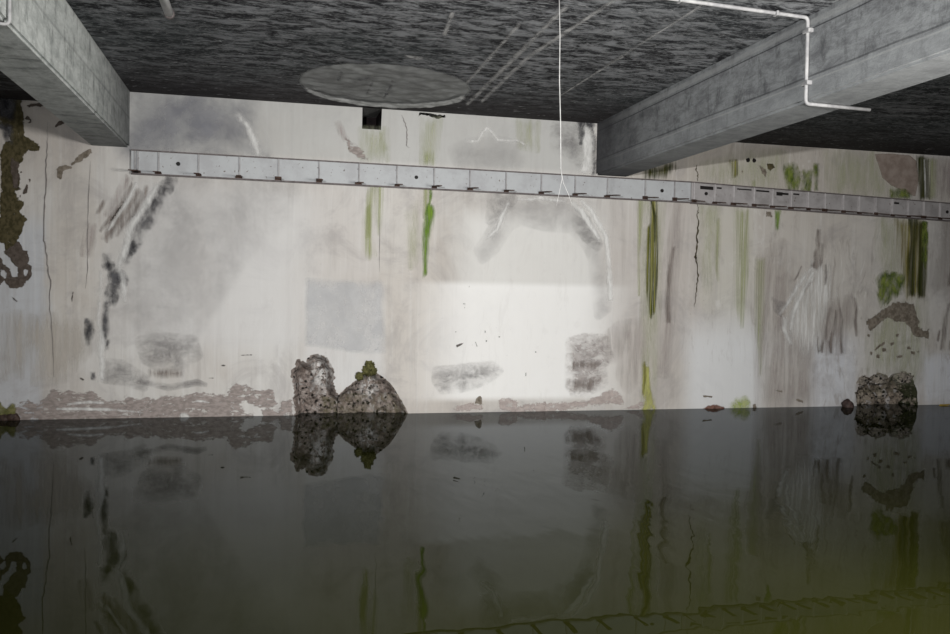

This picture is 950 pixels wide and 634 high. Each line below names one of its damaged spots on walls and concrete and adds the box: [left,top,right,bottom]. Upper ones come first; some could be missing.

flaking render [876,154,919,196]
leakage [16,179,173,379]
crack [692,204,700,302]
leakage [878,219,928,304]
peeling [15,354,408,420]
spalling [855,301,929,405]